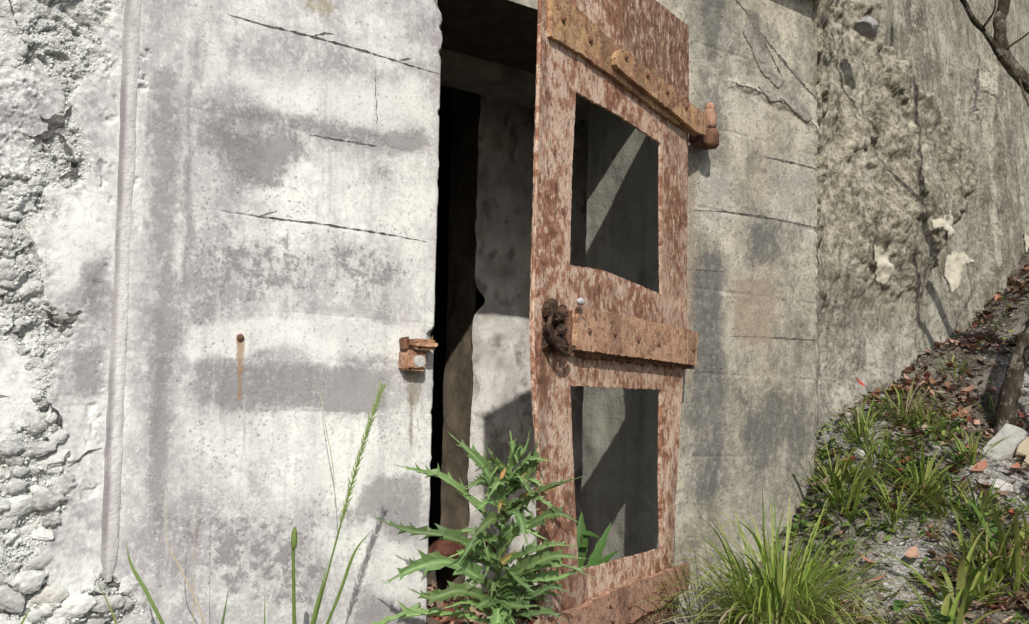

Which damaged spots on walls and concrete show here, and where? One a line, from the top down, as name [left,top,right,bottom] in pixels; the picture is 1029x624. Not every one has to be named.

crack [734,1,819,133]
damp [205,104,429,186]
peeling [874,242,894,288]
peeling [930,209,975,292]
spalling [0,0,152,624]
corrosion [237,340,246,439]
damp [201,364,384,414]